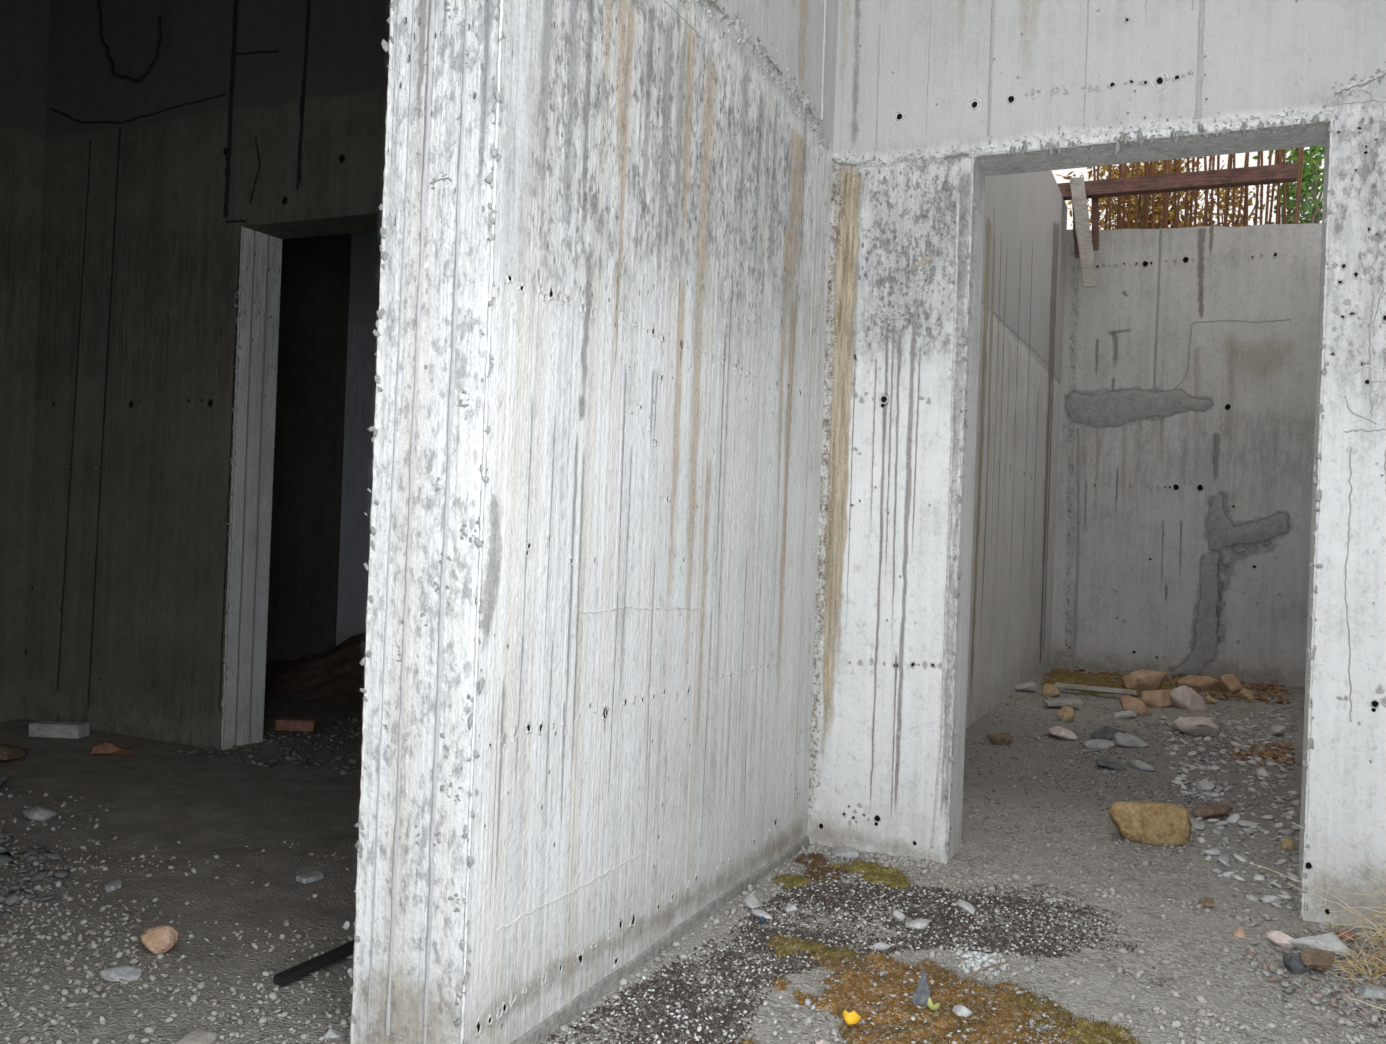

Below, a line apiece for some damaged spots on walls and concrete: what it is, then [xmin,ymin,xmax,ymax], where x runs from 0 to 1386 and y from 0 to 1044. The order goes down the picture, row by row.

crack [223,136,261,218]
damp [419,0,446,178]
damp [479,0,490,157]
damp [504,0,551,271]
damp [567,0,593,188]
damp [582,257,591,381]
damp [546,426,585,785]
damp [604,374,632,776]